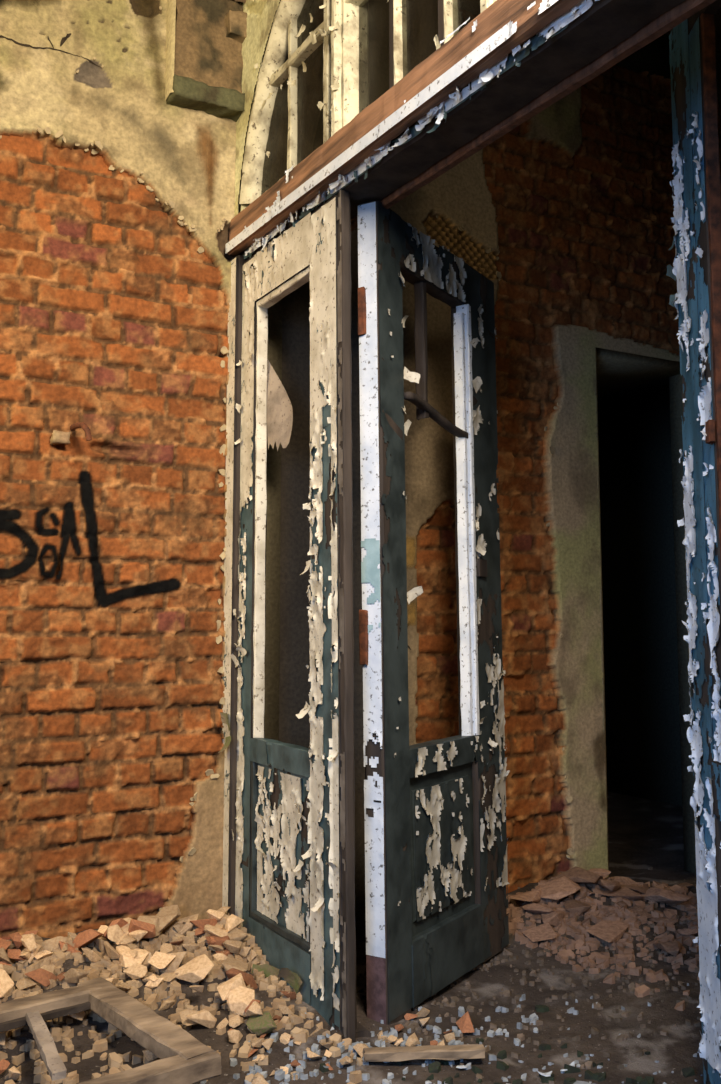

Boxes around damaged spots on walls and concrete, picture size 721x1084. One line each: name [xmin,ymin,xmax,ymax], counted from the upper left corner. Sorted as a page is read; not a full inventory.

crack [0,33,100,67]
flaking render [0,0,600,1038]
flaking render [398,64,712,919]
peeling [677,446,721,1077]